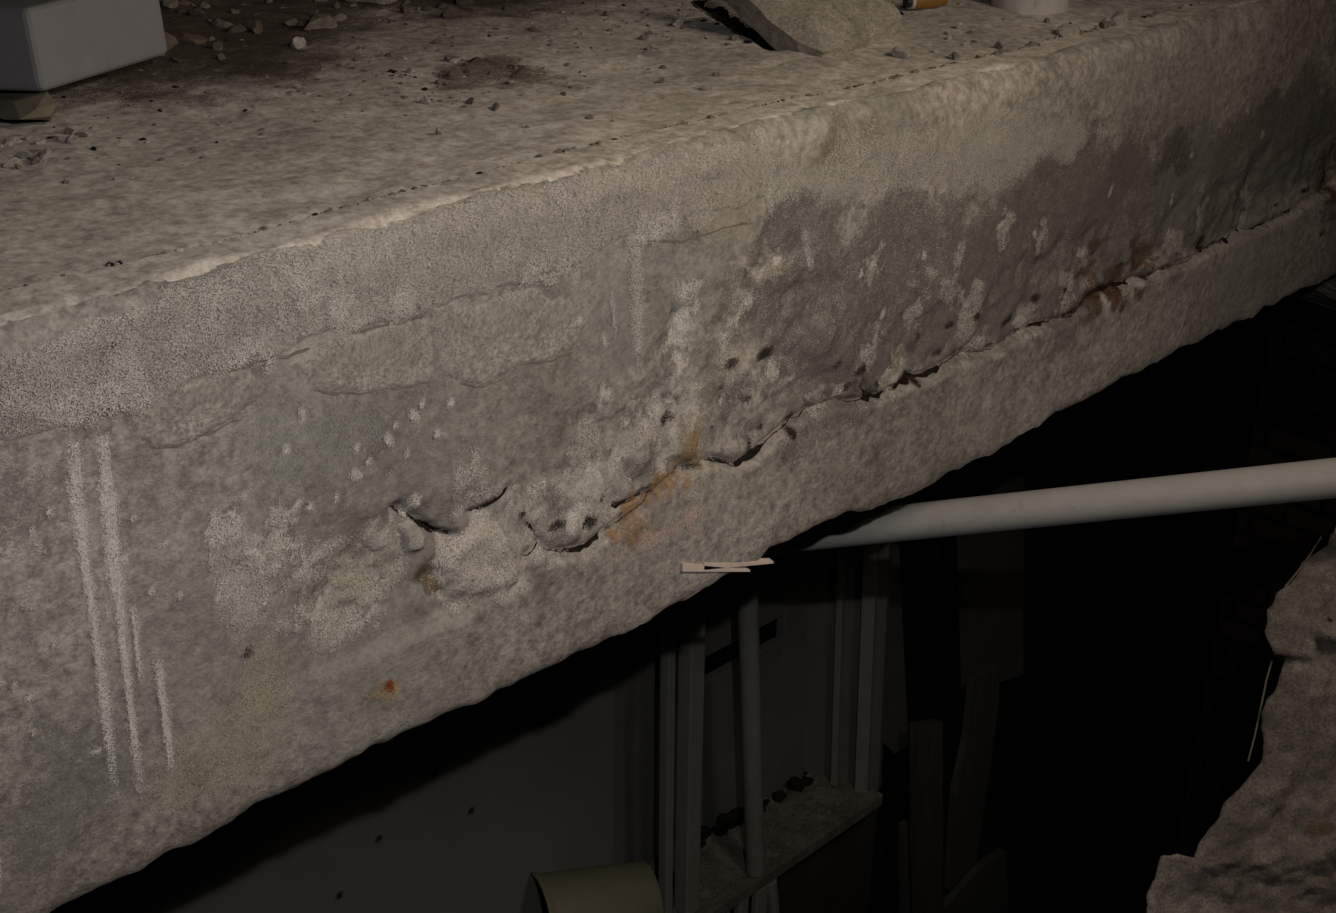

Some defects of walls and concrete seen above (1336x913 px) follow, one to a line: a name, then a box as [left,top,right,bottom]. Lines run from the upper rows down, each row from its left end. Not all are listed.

water stain [0,432,310,894]
crack [390,487,507,534]
rust [600,424,704,557]
spalling [502,185,1231,571]
crack [524,188,1322,556]